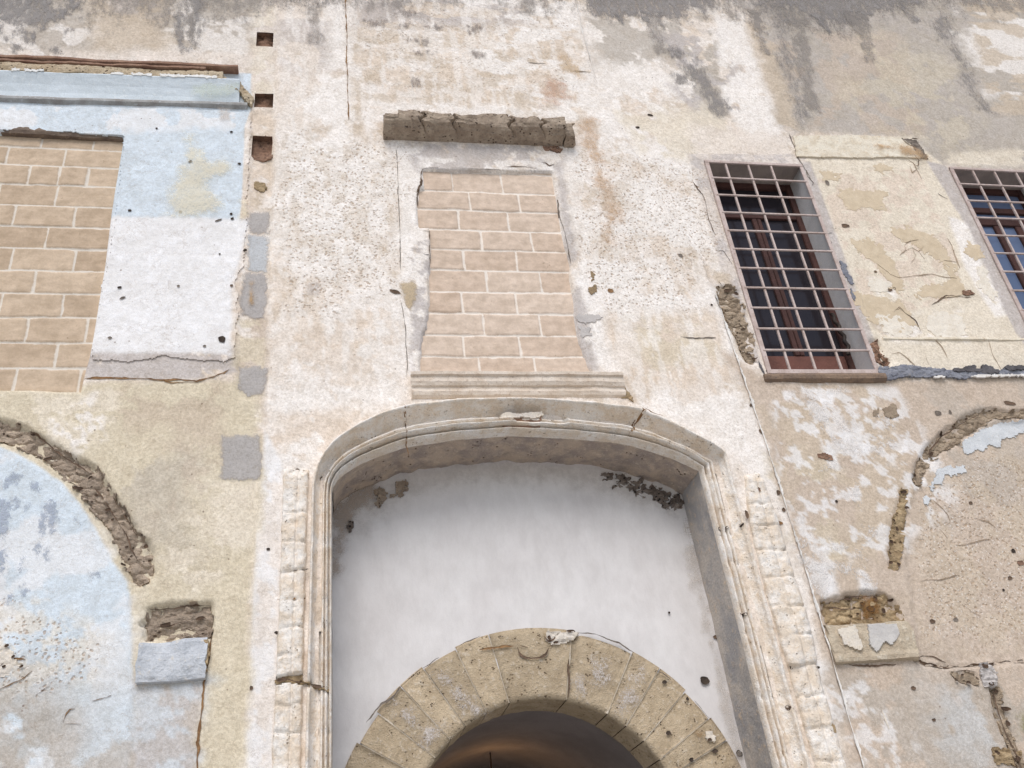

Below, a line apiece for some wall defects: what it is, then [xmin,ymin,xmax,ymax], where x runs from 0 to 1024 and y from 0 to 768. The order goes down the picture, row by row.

water stain [638,11,682,58]
spalling [716,284,758,365]
spalling [870,339,890,367]
peeling [849,224,975,333]
crack [878,238,971,365]
crack [631,408,663,431]
spalling [0,422,155,587]
spalling [600,472,684,511]
spalling [866,408,1024,571]
spalling [798,539,905,625]
spalling [144,601,214,674]
crack [196,635,212,768]